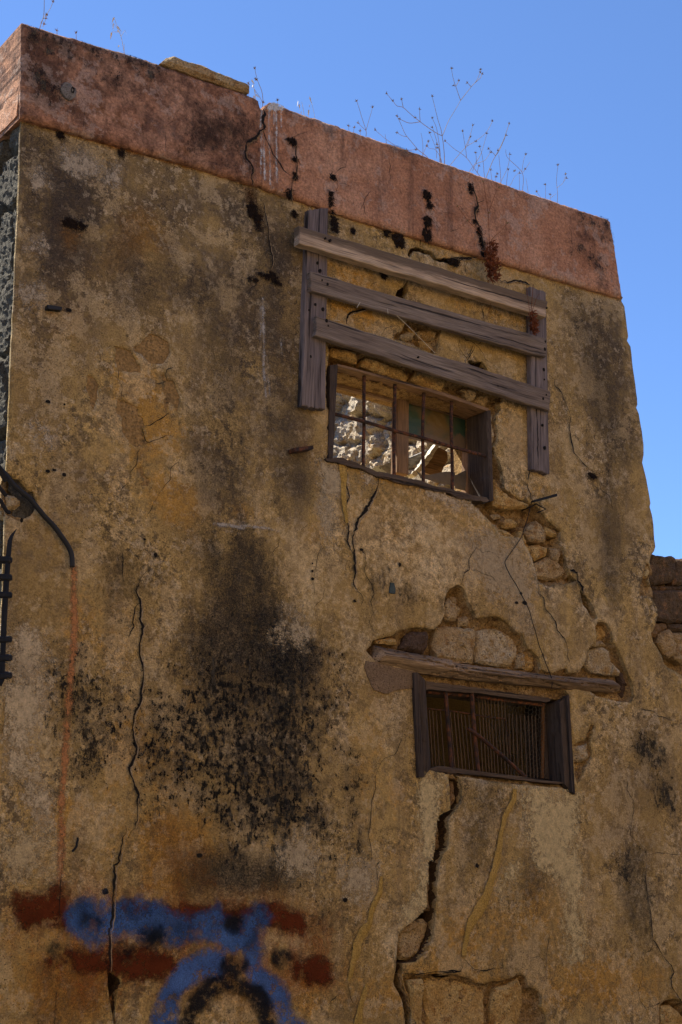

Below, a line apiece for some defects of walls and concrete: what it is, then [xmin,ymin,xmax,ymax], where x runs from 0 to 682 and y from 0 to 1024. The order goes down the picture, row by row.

crack [244,108,305,298]
rust [56,566,79,888]
crack [106,553,146,971]
leakage [0,523,380,933]
crack [339,464,381,631]
flaking render [327,343,571,587]
crack [406,789,517,975]
flaking render [366,587,632,703]